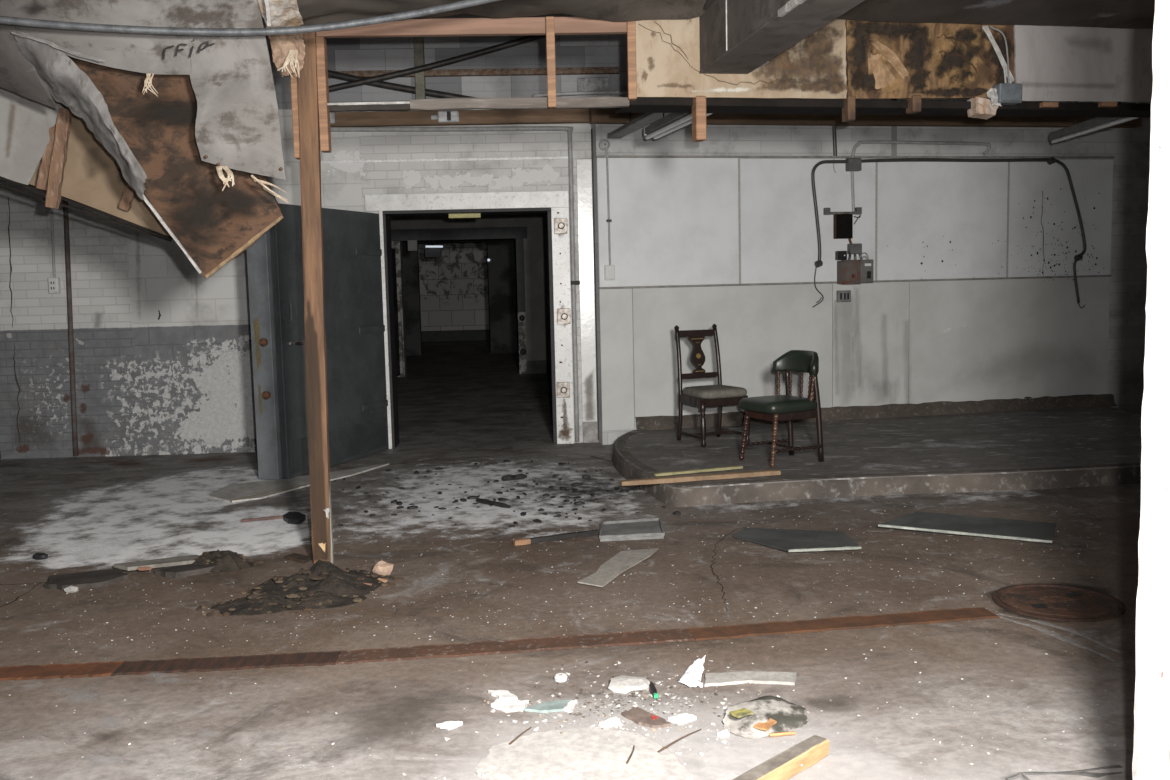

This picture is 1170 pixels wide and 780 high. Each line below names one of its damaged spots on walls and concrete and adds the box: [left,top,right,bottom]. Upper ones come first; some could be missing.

crack [639,21,804,85]
water stain [756,21,1013,98]
peeling [29,357,71,434]
peeling [101,335,257,456]
crack [710,523,756,609]